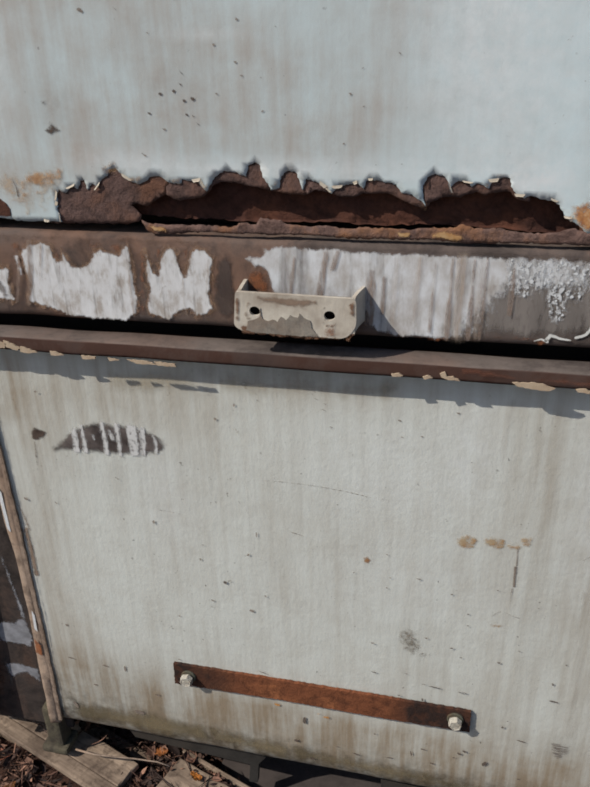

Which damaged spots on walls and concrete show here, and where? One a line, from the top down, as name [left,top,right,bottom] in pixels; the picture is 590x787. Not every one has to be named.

corrosion [0,199,11,216]
corrosion [22,171,61,184]
corrosion [51,162,590,246]
peeling [0,242,215,320]
corrosion [215,257,333,339]
corrosion [317,251,339,296]
corrosion [364,277,384,326]
peeling [245,247,590,338]